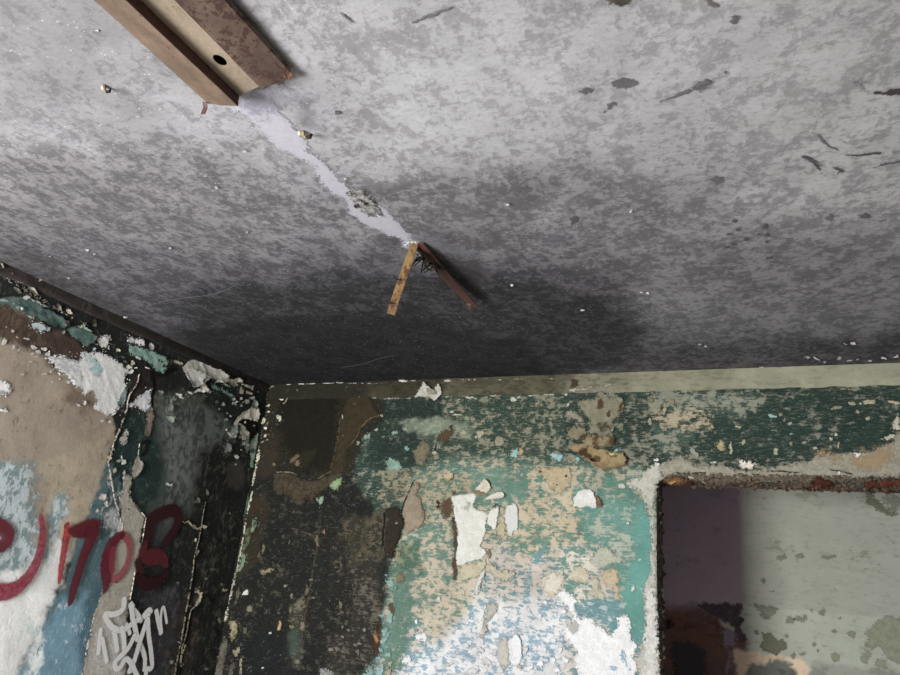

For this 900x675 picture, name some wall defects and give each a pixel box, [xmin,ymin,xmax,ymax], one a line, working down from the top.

spalling [345,189,382,217]
flaking render [564,391,583,423]
flaking render [0,262,413,675]
flaking render [404,439,437,466]
peeling [444,399,900,675]